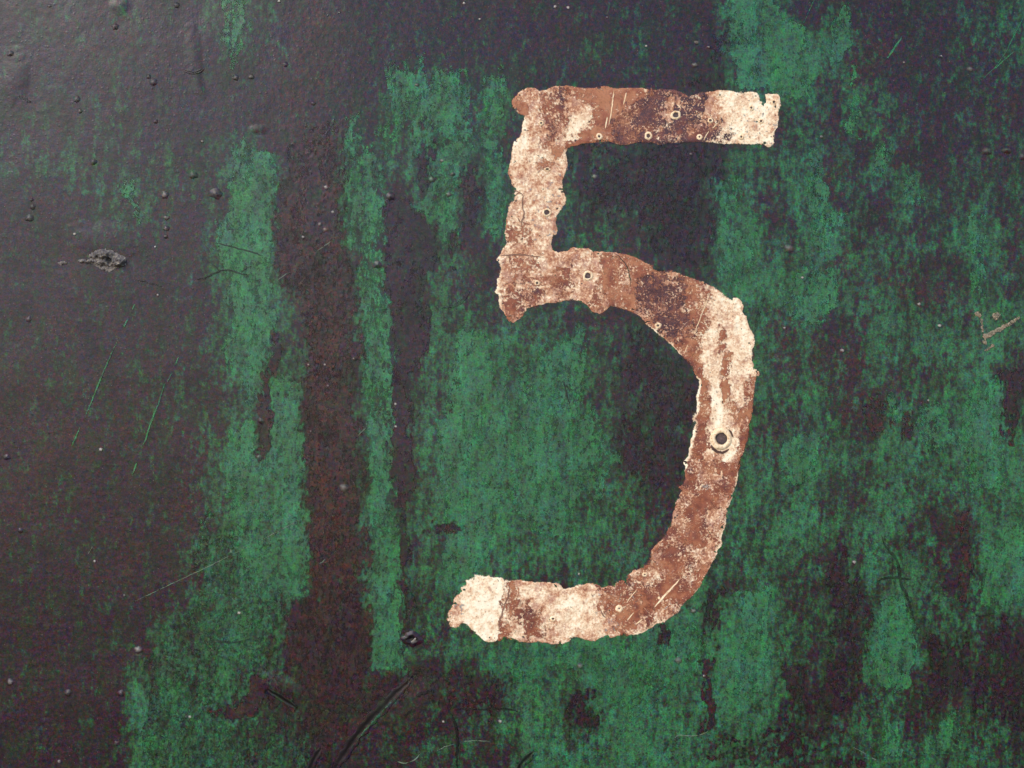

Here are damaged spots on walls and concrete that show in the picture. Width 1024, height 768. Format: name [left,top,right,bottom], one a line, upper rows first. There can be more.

peeling [221,0,250,69]
rust [512,85,732,170]
peeling [57,249,126,272]
rust [500,217,575,320]
rust [588,252,758,636]
rust [498,580,550,643]